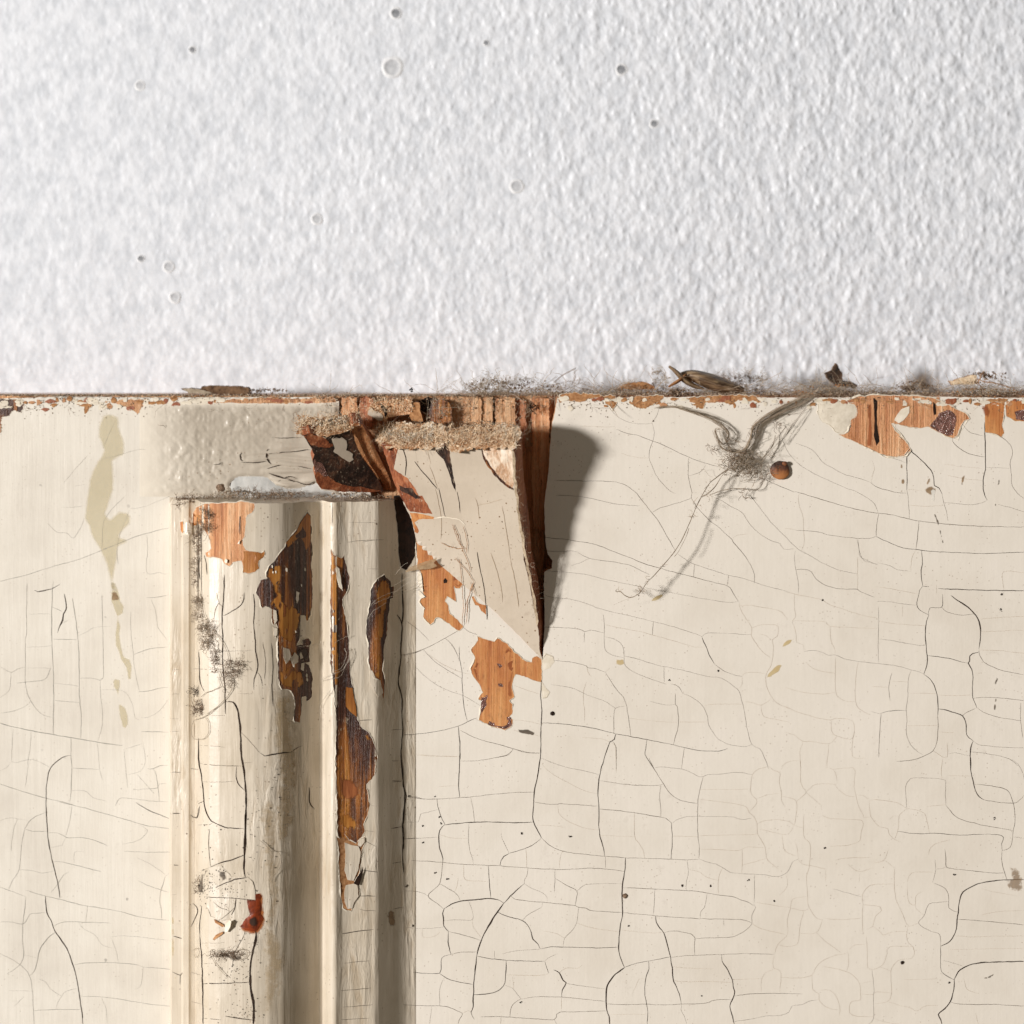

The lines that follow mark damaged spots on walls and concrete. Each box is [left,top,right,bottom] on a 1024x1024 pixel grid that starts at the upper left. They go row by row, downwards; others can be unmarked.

peeling [558,392,1024,458]
crack [0,484,301,1024]
peeling [179,476,354,723]
peeling [329,549,378,912]
peeling [366,574,394,699]
peeling [415,542,486,631]
peeling [469,636,555,731]
crack [342,410,1024,1024]